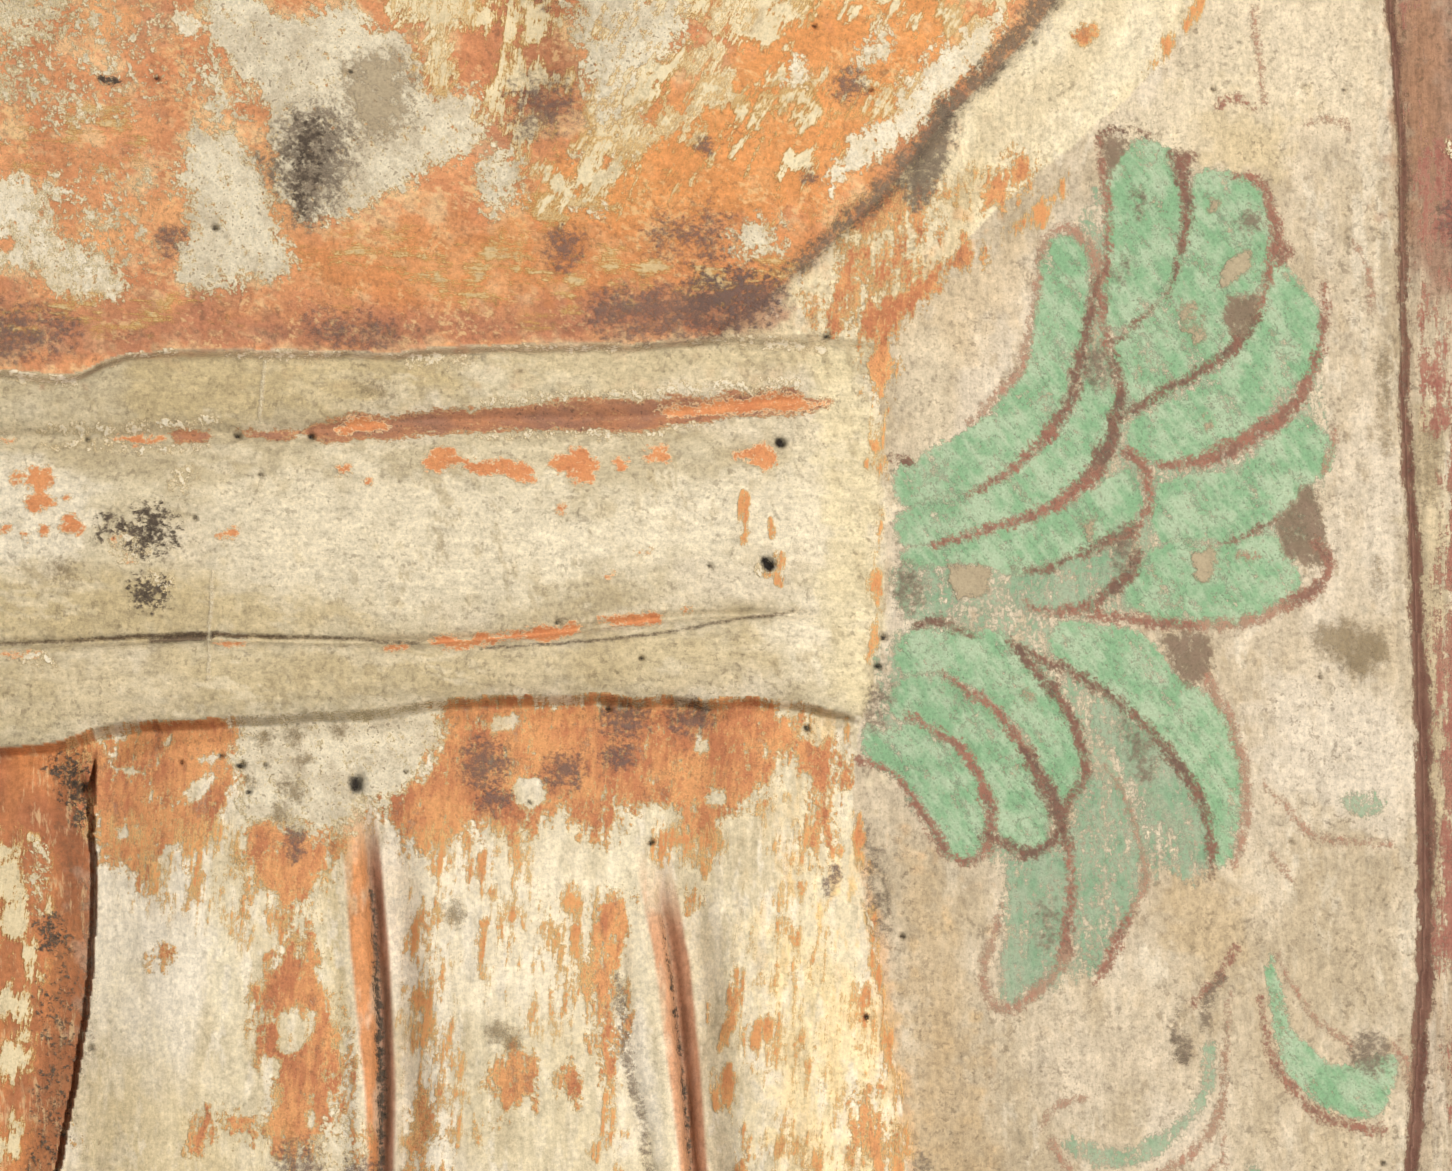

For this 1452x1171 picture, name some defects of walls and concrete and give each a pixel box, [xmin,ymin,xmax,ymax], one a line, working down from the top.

peeling [1070,23,1100,48]
peeling [1141,0,1205,73]
peeling [0,0,1069,481]
peeling [865,508,885,664]
peeling [0,829,54,1169]
peeling [64,692,914,1171]